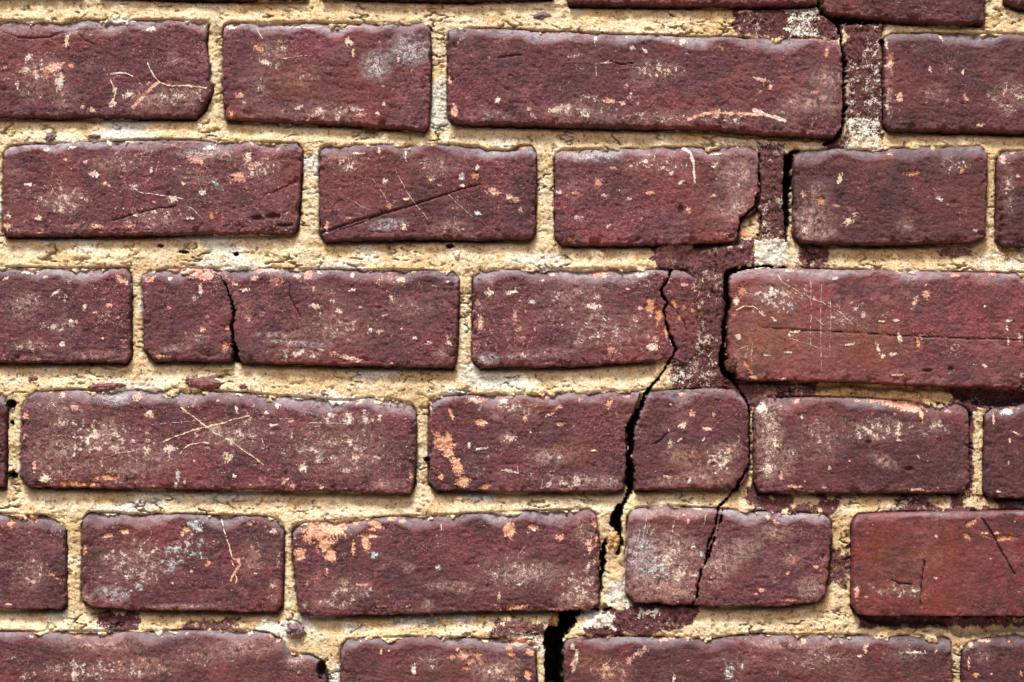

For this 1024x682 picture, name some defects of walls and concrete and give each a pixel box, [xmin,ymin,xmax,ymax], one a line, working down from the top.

crack [222,280,241,361]
crack [543,270,698,682]
crack [692,0,876,603]